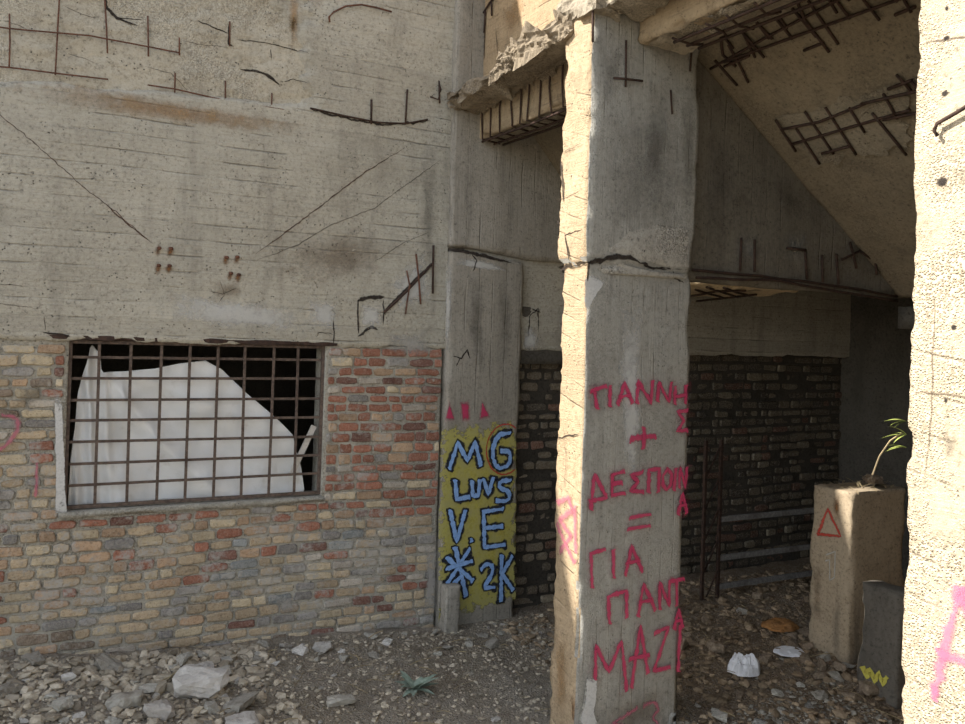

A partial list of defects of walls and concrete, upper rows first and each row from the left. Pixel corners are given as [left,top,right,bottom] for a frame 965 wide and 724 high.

spalling [646,0,917,86]
spalling [481,64,567,146]
spalling [774,74,917,168]
crack [0,115,153,244]
crack [256,148,435,260]
crack [557,143,687,282]
peeling [579,675,597,724]